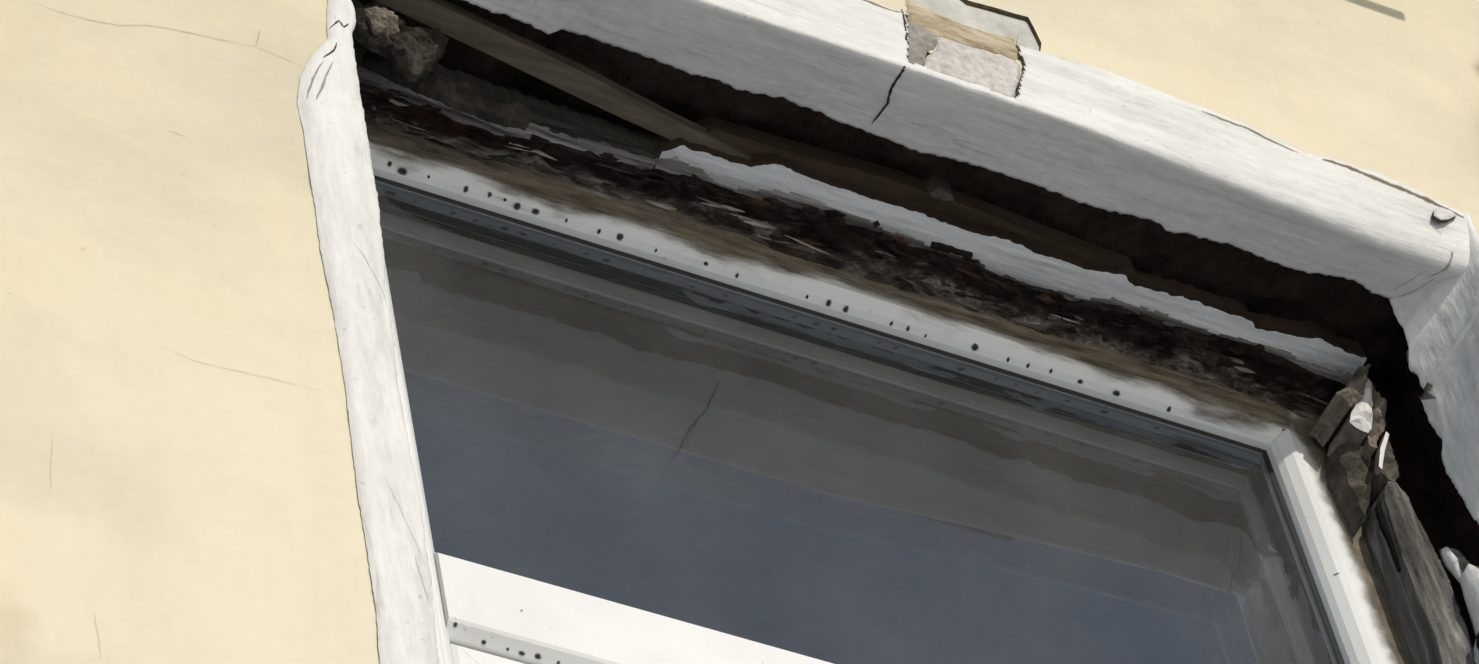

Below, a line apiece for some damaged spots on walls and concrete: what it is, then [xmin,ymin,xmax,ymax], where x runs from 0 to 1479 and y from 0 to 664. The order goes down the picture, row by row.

crack [871,9,908,124]
flaking render [865,0,1039,97]
water stain [365,122,1410,664]
flaking render [1309,364,1399,538]